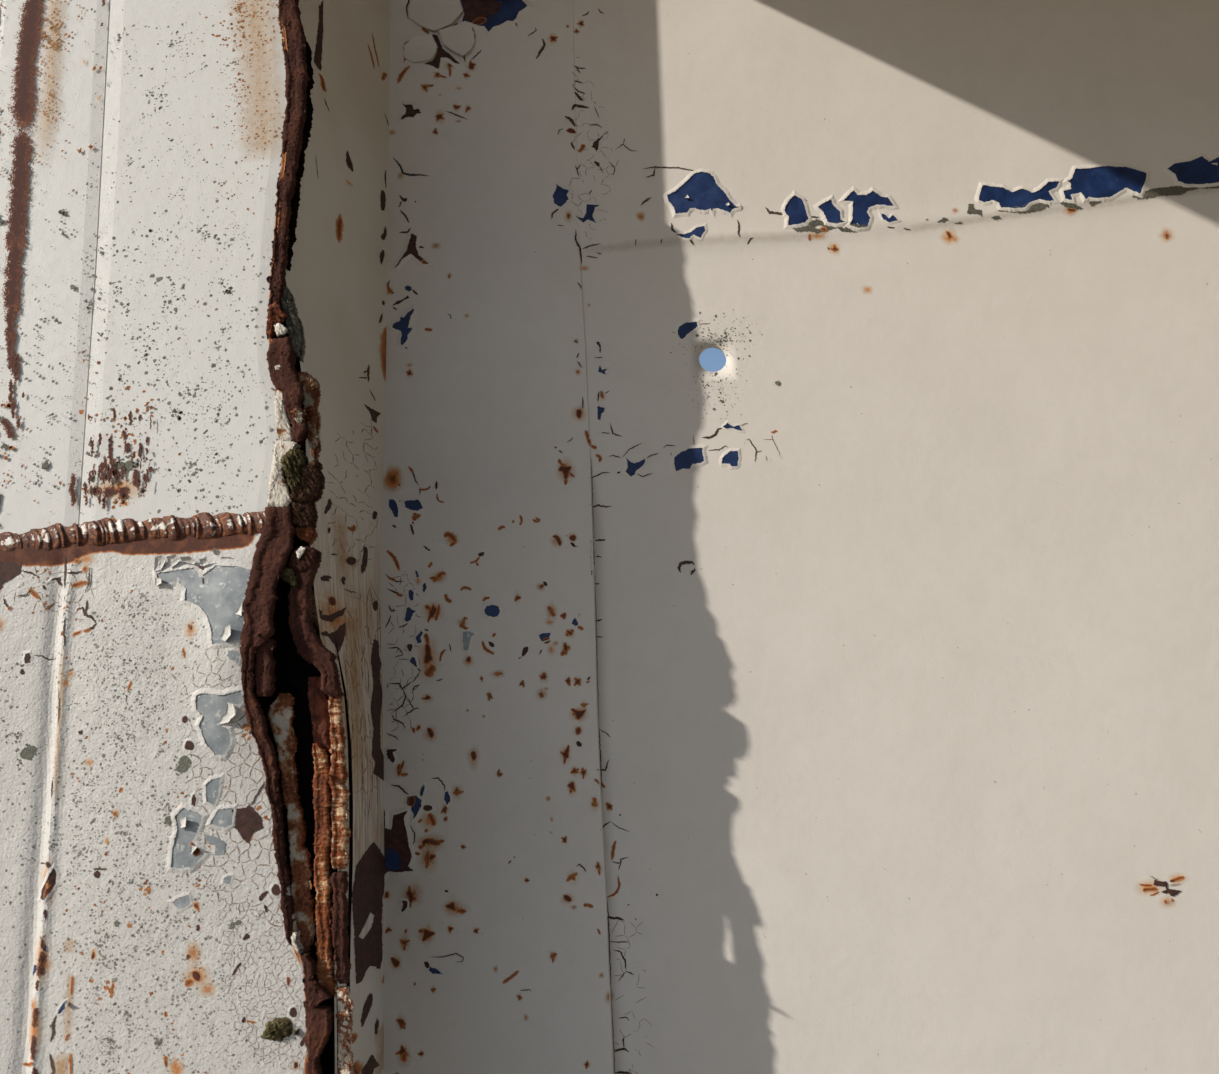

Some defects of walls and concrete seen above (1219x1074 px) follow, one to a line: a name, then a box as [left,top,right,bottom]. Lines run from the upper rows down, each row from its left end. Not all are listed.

corrosion [0,0,102,495]
crack [529,27,670,288]
peeling [648,166,743,244]
peeling [766,185,902,234]
peeling [926,152,1219,224]
corrosion [59,351,181,520]
corrosion [0,532,255,638]
peeling [152,548,252,667]
crack [183,0,442,1074]
crack [559,423,623,790]
corrosion [23,939,48,1074]
crack [607,898,653,1074]